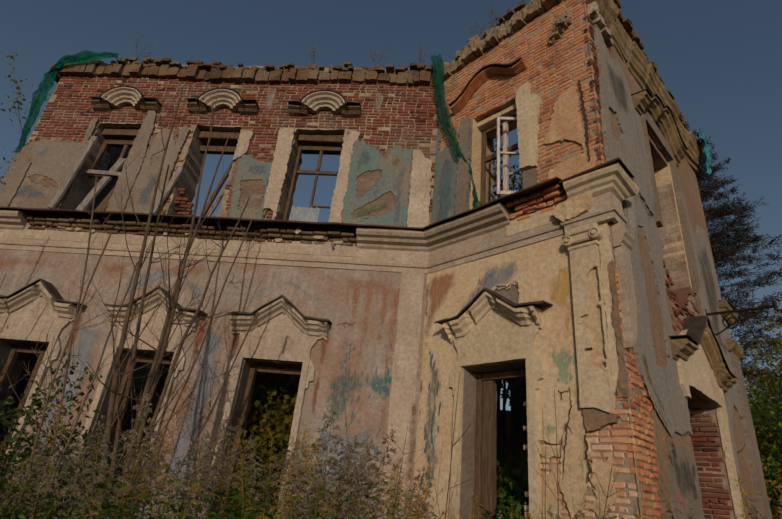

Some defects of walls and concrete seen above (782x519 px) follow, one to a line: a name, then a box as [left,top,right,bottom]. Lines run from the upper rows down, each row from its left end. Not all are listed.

peeling [468,263,519,307]
flaking render [552,261,629,398]
peeling [316,343,392,498]
peeling [420,351,441,488]
crack [558,387,592,482]
flaking render [582,408,620,432]